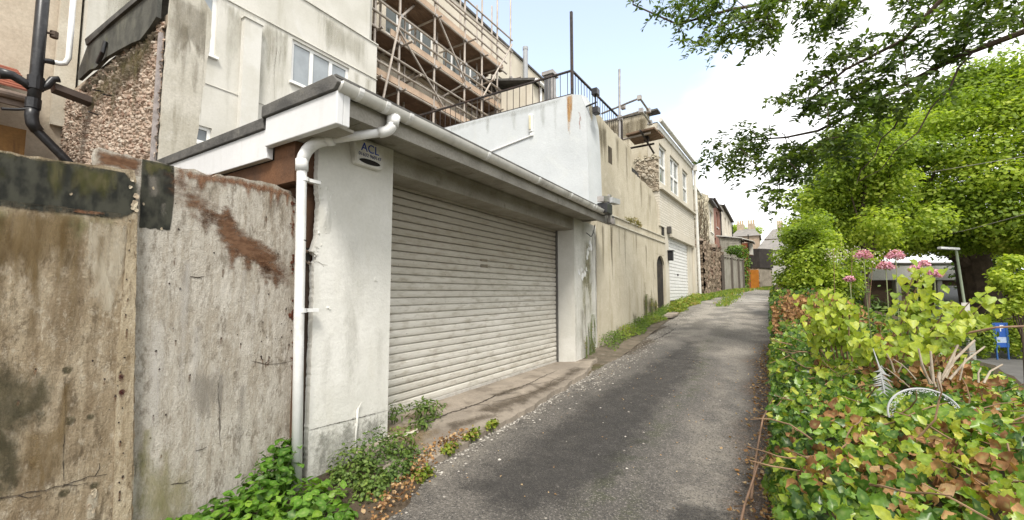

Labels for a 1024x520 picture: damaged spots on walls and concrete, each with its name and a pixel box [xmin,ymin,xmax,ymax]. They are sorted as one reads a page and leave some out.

water stain [97,150,140,174]
rust [173,170,289,287]
water stain [0,374,67,491]
crack [0,377,107,499]